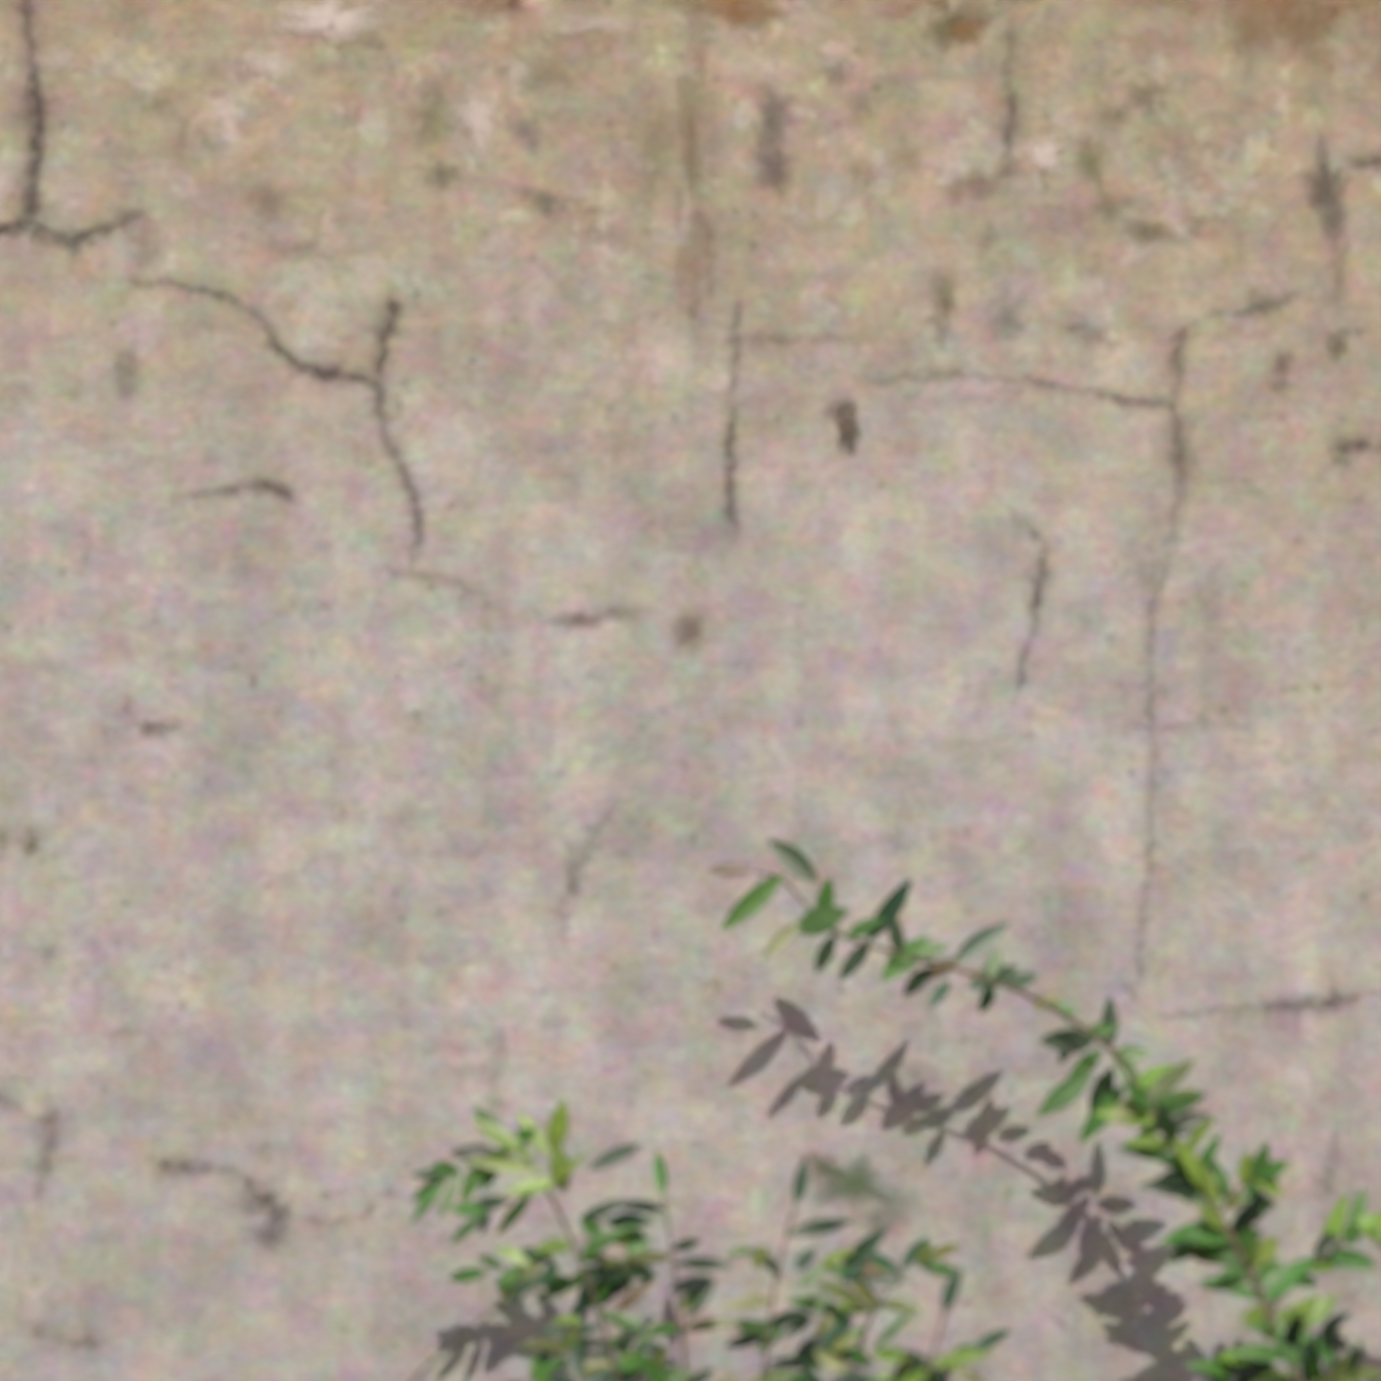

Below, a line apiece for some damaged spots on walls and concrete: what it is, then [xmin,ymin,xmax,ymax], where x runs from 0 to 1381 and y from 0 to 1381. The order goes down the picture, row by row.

crack [0,92,41,235]
crack [313,354,385,403]
crack [1340,441,1367,451]